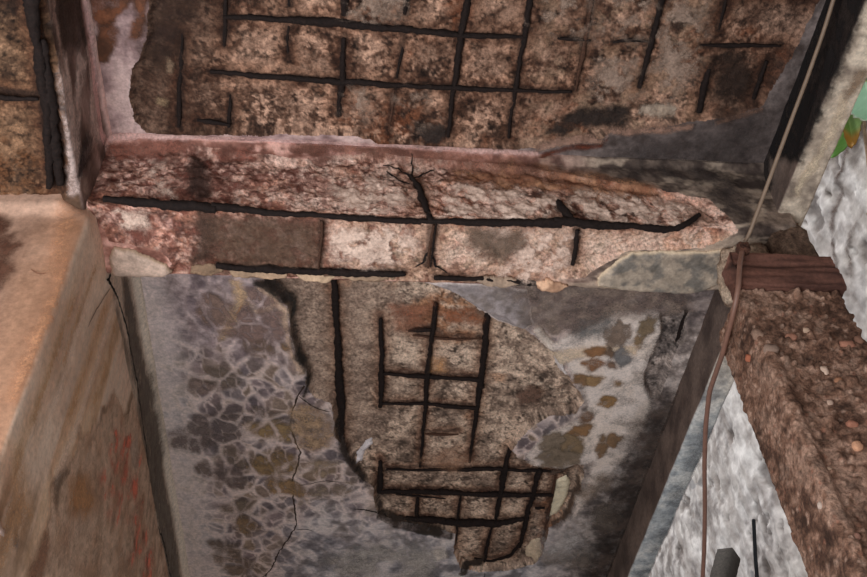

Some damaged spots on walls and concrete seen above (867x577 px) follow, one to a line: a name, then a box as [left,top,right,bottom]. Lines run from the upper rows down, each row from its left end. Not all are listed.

rust [89,0,147,64]
spalling [0,0,70,201]
spalling [129,0,819,158]
rust [108,140,256,200]
crack [383,155,434,214]
water stain [0,217,22,282]
rust [121,228,150,245]
spalling [87,142,738,572]
water stain [55,279,353,577]
crack [223,279,453,577]
crack [548,467,581,527]
crack [458,555,486,577]